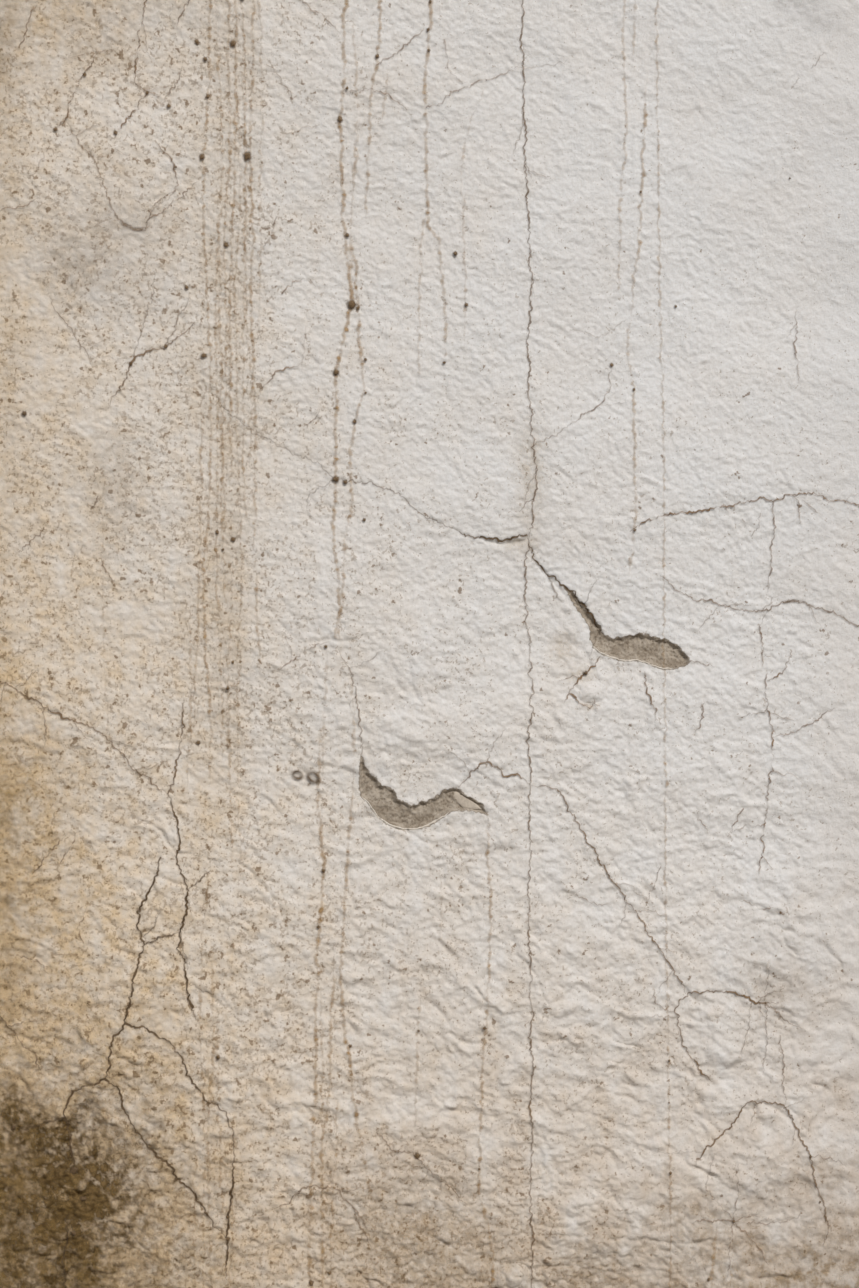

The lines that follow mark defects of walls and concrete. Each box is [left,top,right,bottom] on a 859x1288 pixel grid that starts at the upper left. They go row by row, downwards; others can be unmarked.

crack [353,2,769,1079]
spalling [564,587,690,670]
crack [640,492,859,640]
spalling [359,756,488,830]
crack [704,672,823,865]
crack [0,681,235,1265]
water stain [0,1096,148,1288]
crack [527,1011,535,1280]
crack [701,1100,829,1226]